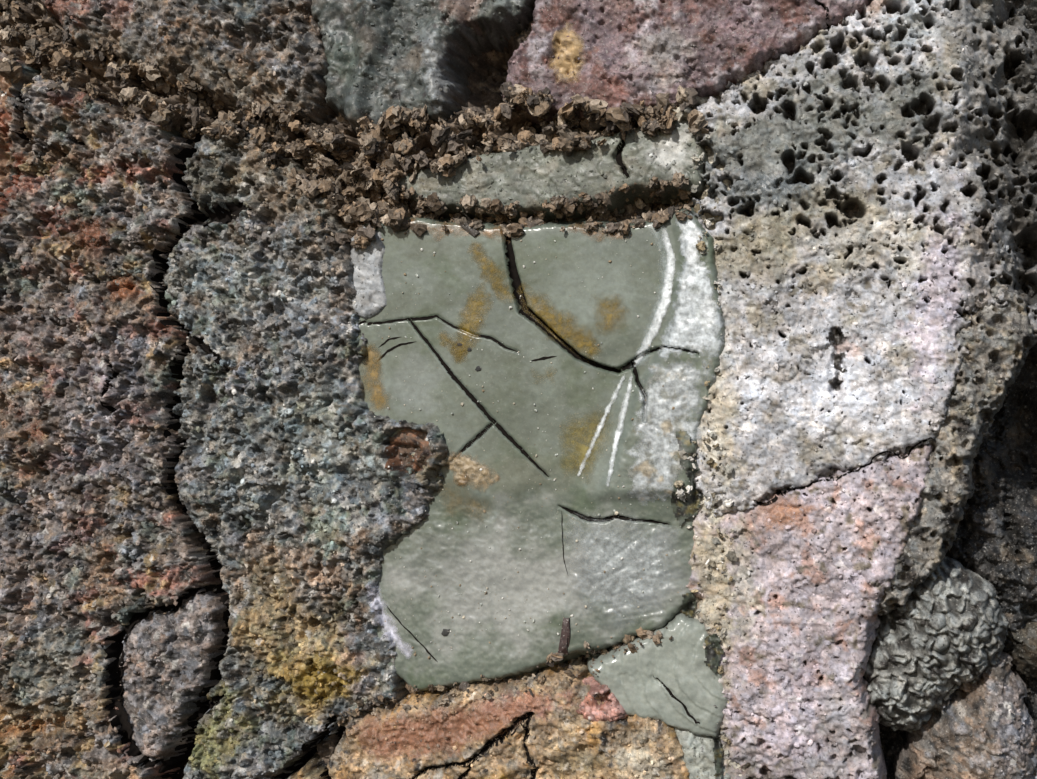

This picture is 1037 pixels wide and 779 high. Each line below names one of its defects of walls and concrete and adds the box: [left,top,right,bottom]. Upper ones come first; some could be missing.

crack [358,216,697,477]
crack [100,116,252,779]
crack [560,506,670,574]
crack [385,604,437,661]
crack [271,715,346,779]
crack [411,712,539,779]